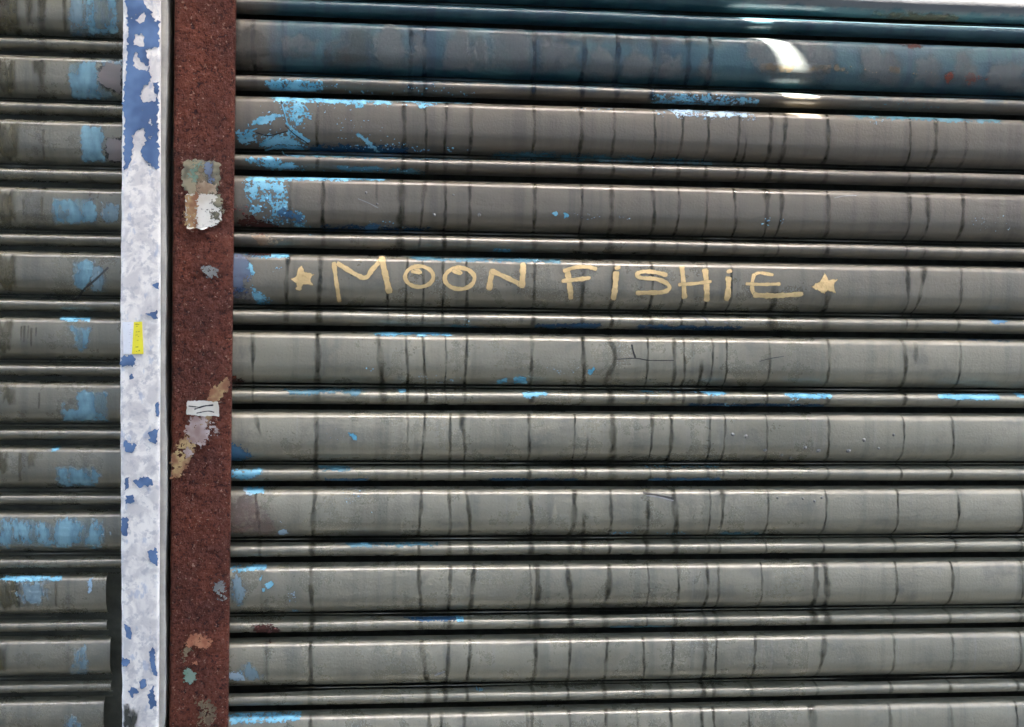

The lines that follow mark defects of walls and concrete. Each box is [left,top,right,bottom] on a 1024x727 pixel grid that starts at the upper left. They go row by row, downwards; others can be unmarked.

peeling [68,0,161,170]
peeling [235,78,712,235]
peeling [53,199,119,224]
peeling [74,259,104,292]
peeling [119,355,136,379]
peeling [123,402,160,453]
peeling [124,477,153,504]
peeling [121,517,129,536]
peeling [147,547,158,566]
peeling [0,575,62,604]
peeling [128,647,158,709]